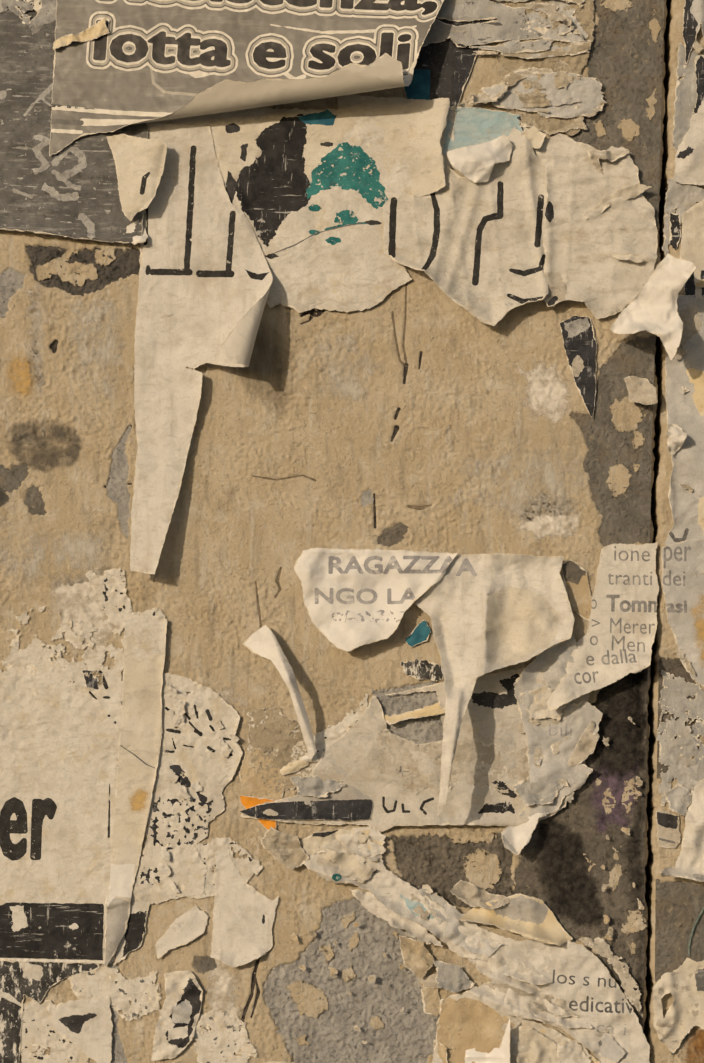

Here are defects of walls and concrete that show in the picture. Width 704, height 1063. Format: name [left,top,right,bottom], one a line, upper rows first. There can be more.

spalling [494,0,664,229]
spalling [0,245,140,318]
damp [13,425,80,470]
spalling [106,426,131,539]
spalling [372,681,443,744]
spalling [391,657,704,1030]
spalling [263,898,448,1063]